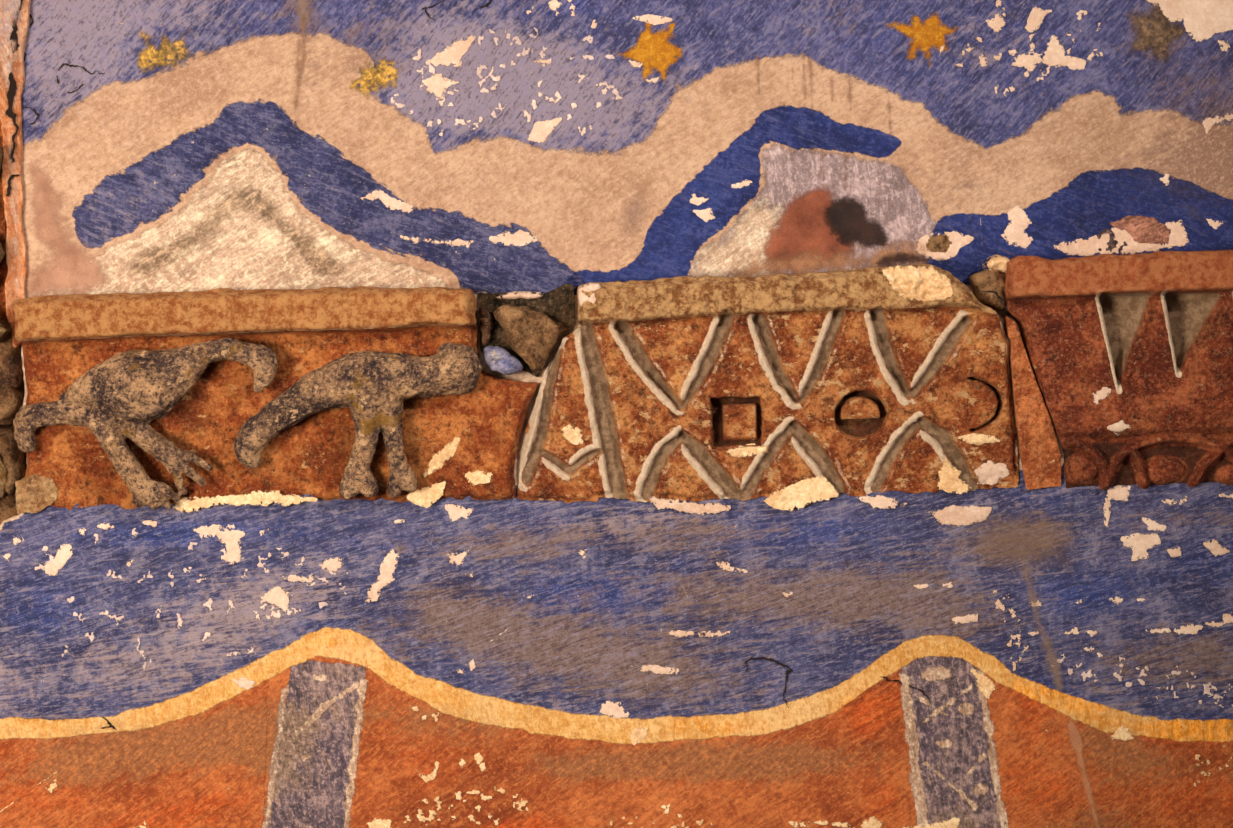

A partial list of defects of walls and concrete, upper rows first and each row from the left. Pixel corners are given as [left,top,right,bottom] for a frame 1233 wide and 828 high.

peeling [1147,0,1233,52]
crack [5,0,39,196]
crack [56,63,105,93]
peeling [390,28,592,143]
peeling [173,490,317,512]
peeling [1103,485,1131,527]
peeling [35,543,73,576]
peeling [188,524,347,621]
peeling [365,549,400,603]
peeling [1120,517,1182,561]
crack [745,657,793,709]
peeling [366,786,529,828]